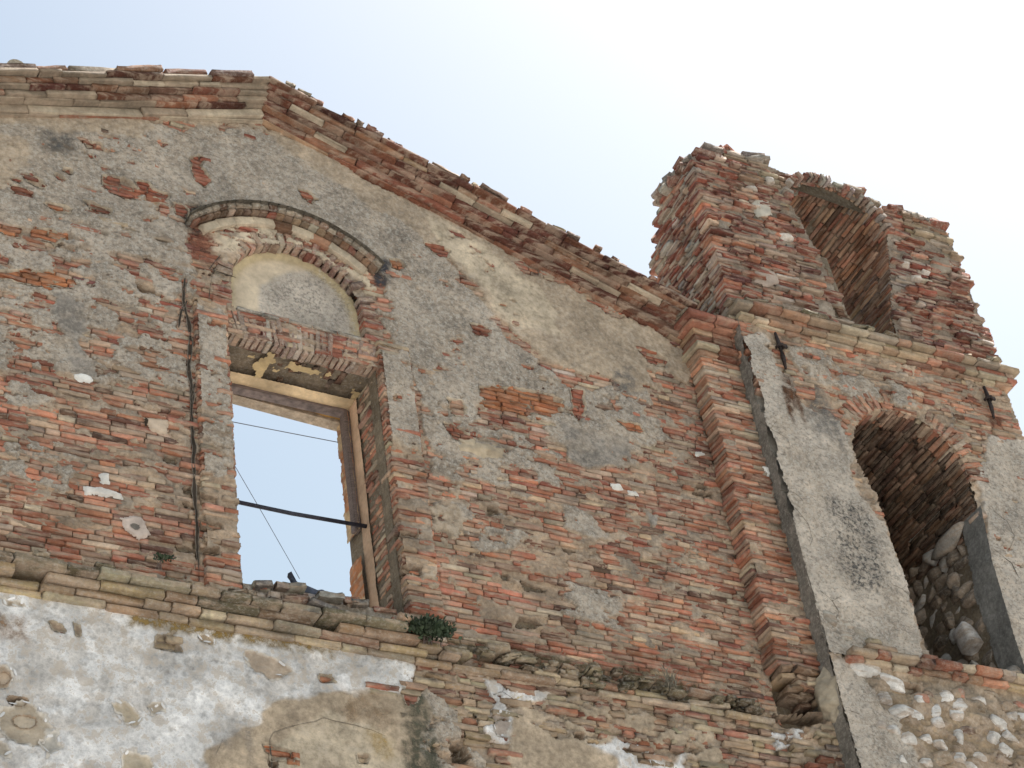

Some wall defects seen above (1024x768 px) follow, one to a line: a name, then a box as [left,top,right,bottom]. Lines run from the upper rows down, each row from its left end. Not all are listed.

spalling [189,153,212,187]
spalling [10,166,191,219]
spalling [0,224,68,248]
spalling [0,268,76,290]
spalling [443,383,590,443]
spalling [48,620,82,637]
spalling [153,629,183,652]
flaking render [243,649,294,682]
flaking render [0,700,64,759]
spalling [771,712,827,729]
spalling [263,744,300,768]
spalling [449,743,473,765]